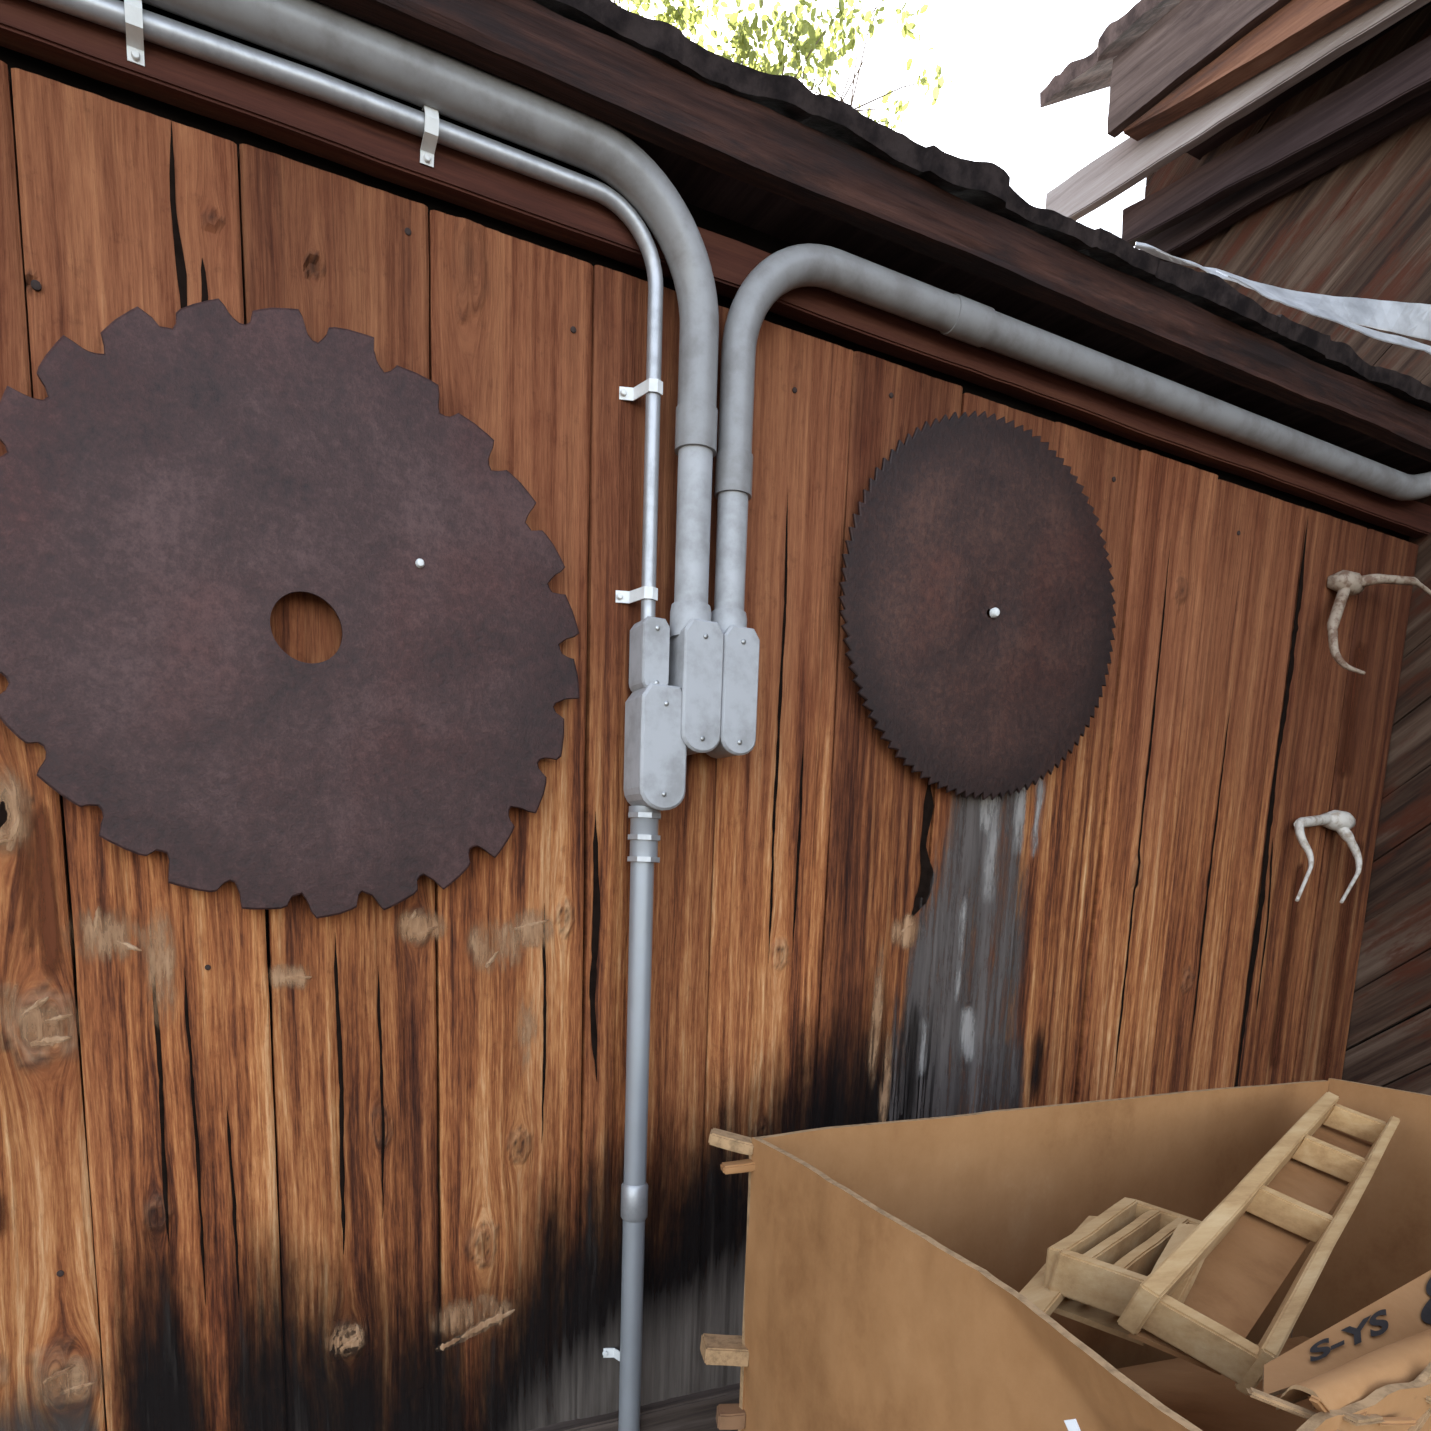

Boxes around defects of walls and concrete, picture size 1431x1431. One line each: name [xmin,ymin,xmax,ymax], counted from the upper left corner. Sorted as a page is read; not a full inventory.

crack [169,119,208,308]
crack [540,907,548,1143]
crack [589,811,600,1080]
damp [720,779,1043,1137]
crack [911,778,934,917]
damp [0,1399,97,1431]
damp [116,1265,209,1431]
damp [227,1155,624,1431]
damp [640,1145,749,1406]